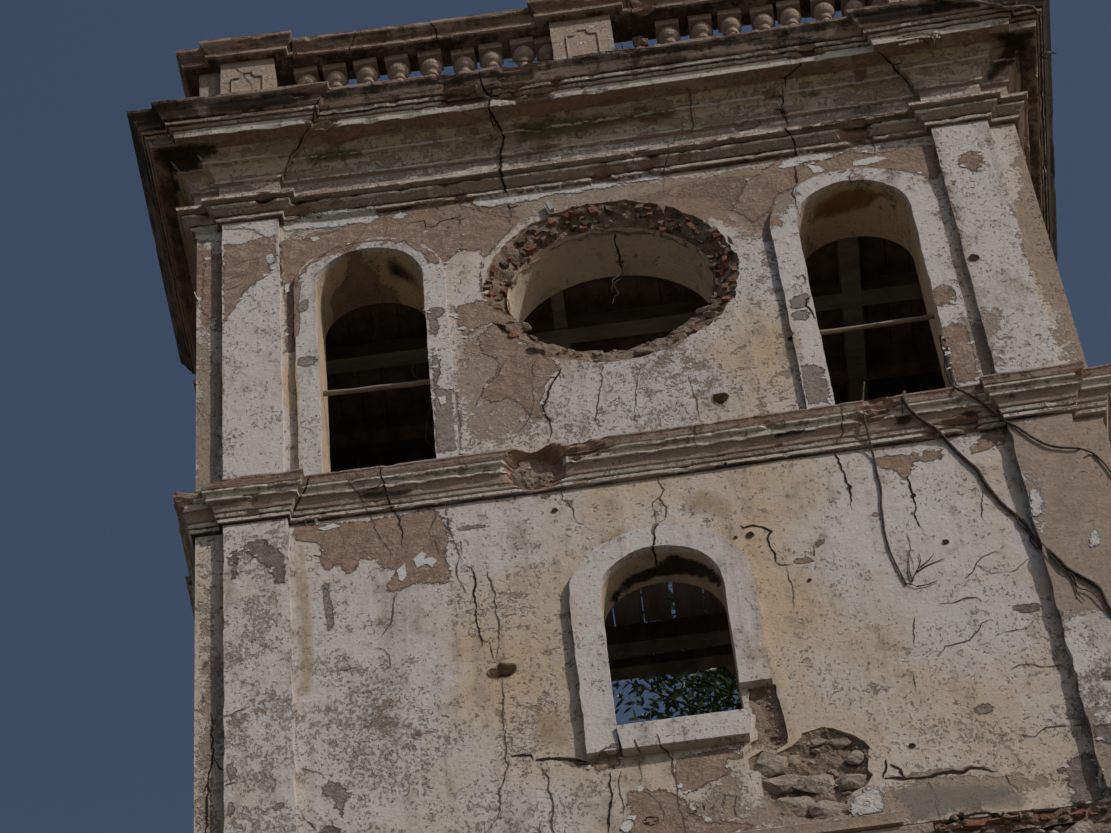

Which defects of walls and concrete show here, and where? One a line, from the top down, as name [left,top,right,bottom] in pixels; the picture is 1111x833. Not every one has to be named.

spalling [194,198,742,419]
crack [476,358,604,521]
crack [834,405,852,508]
flaking render [226,539,286,586]
flaking render [293,506,486,631]
crack [740,524,817,610]
crack [328,466,686,833]
crack [204,708,244,833]
spalling [620,686,872,833]
crack [883,759,1063,826]
flaking render [1056,752,1109,804]
flaking render [1093,723,1111,744]